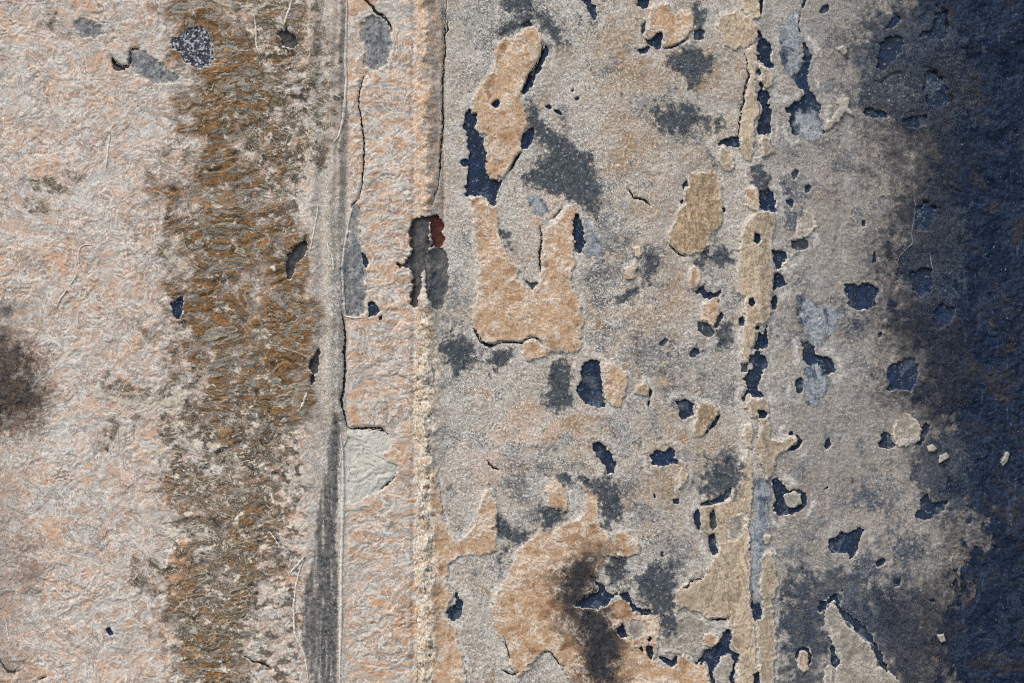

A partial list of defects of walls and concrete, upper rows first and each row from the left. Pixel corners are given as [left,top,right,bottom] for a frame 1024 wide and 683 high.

crack [365,0,392,28]
crack [353,76,365,205]
spalling [397,215,449,310]
crack [432,0,449,202]
peeling [460,21,652,408]
peeling [637,0,774,337]
leakage [0,306,49,435]
crack [340,315,388,434]
peeling [491,188,816,683]
leakage [319,429,338,683]
leakage [562,560,595,603]
leakage [584,610,618,683]